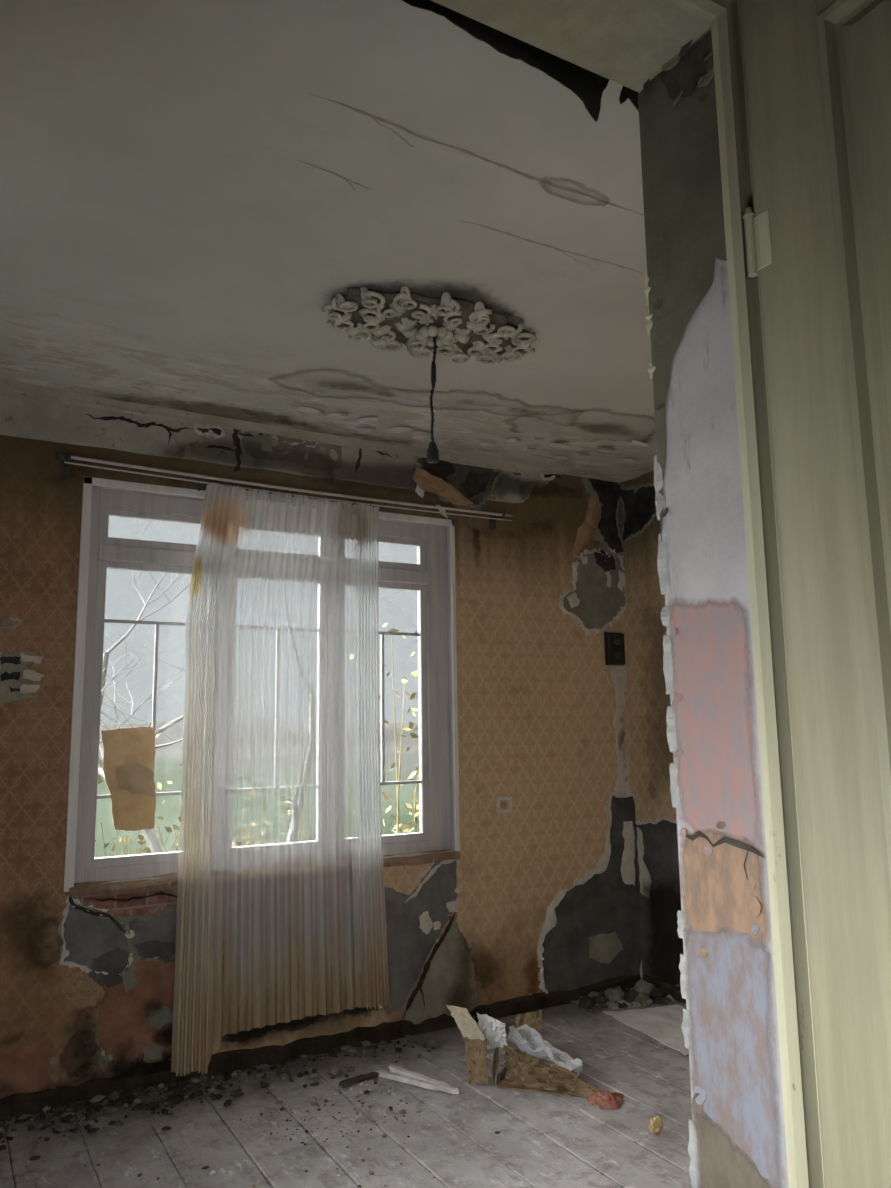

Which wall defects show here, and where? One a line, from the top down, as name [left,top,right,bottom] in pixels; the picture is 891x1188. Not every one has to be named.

crack [311,94,644,216]
crack [460,220,645,275]
crack [86,414,191,445]
crack [215,429,270,472]
damp [114,397,407,443]
damp [169,442,419,491]
damp [495,474,575,496]
damp [580,425,626,434]
peeling [464,30,780,1188]
peeling [20,653,45,693]
flaking render [58,860,461,1066]
damp [75,1026,171,1081]